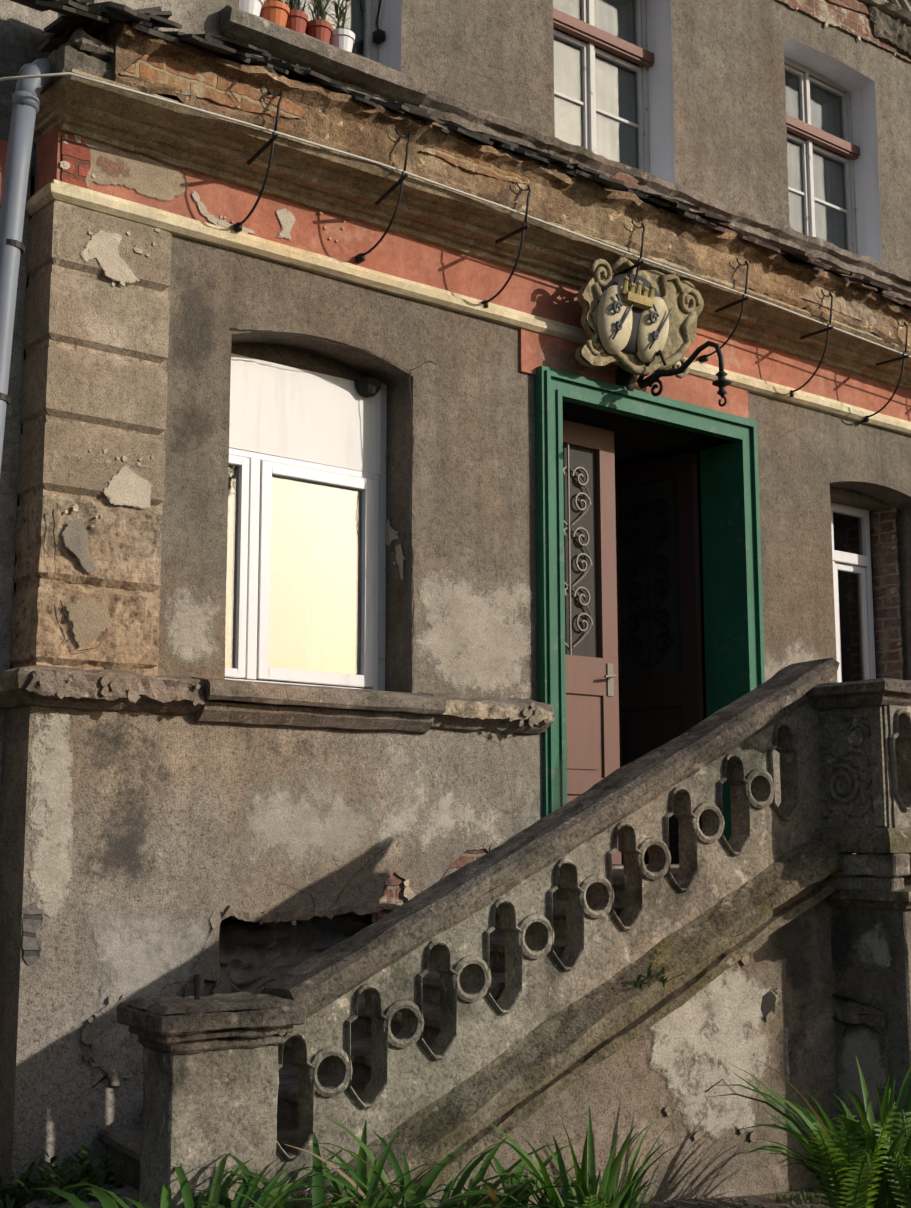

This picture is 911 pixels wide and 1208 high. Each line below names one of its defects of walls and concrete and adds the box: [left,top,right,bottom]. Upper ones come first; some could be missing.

flaking render [775,0,911,63]
spalling [119,55,307,119]
peeling [60,134,255,234]
peeling [81,228,160,287]
peeling [52,439,154,508]
peeling [385,519,406,580]
peeling [415,569,542,728]
leakage [87,789,148,877]
spalling [209,873,416,929]
spalling [167,962,232,998]
peeling [650,955,781,1142]